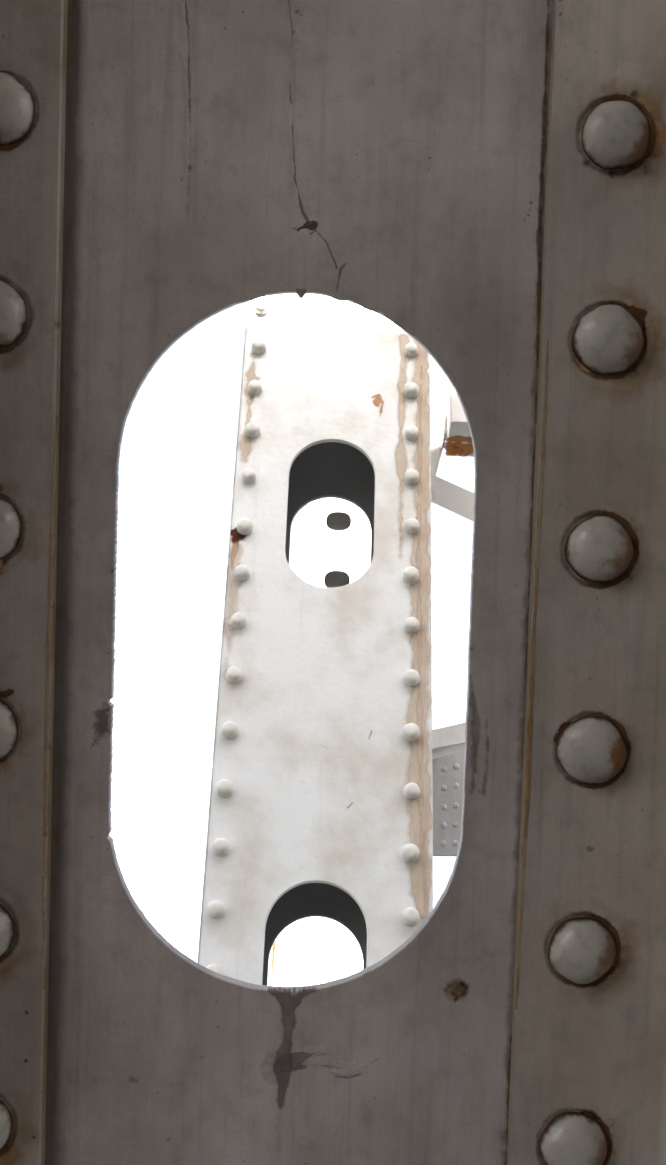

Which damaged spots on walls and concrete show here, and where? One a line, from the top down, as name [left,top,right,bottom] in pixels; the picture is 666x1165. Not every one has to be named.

crack [284,78,345,287]
damp [268,987,381,1108]